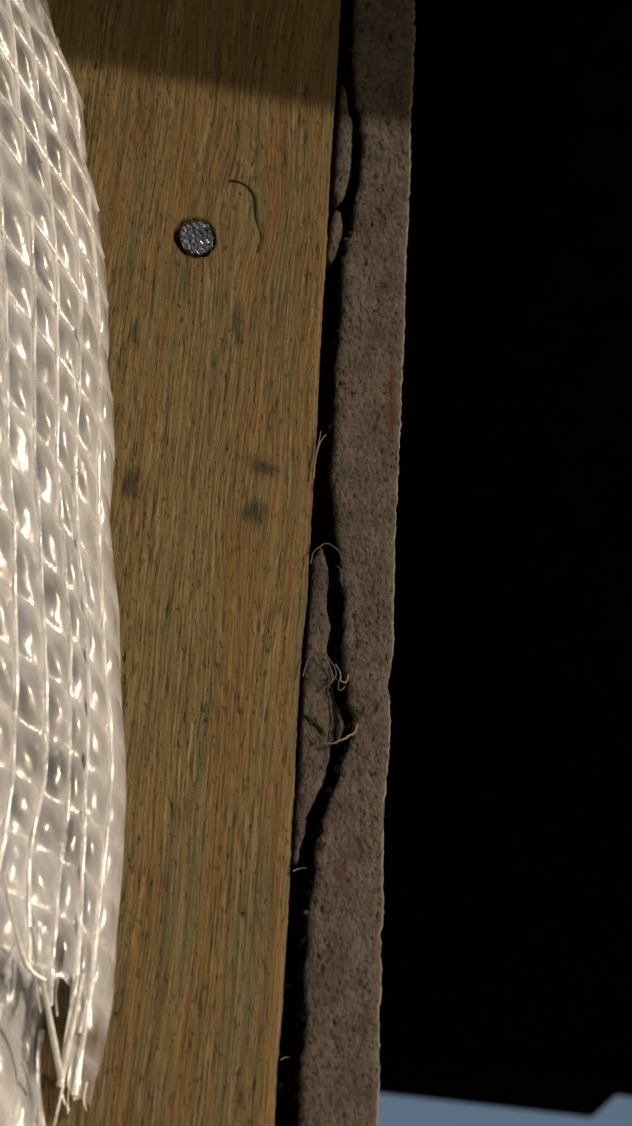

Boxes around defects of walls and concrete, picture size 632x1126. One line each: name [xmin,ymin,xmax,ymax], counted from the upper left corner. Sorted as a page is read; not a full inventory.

crack [324,0,362,292]
crack [290,547,353,888]